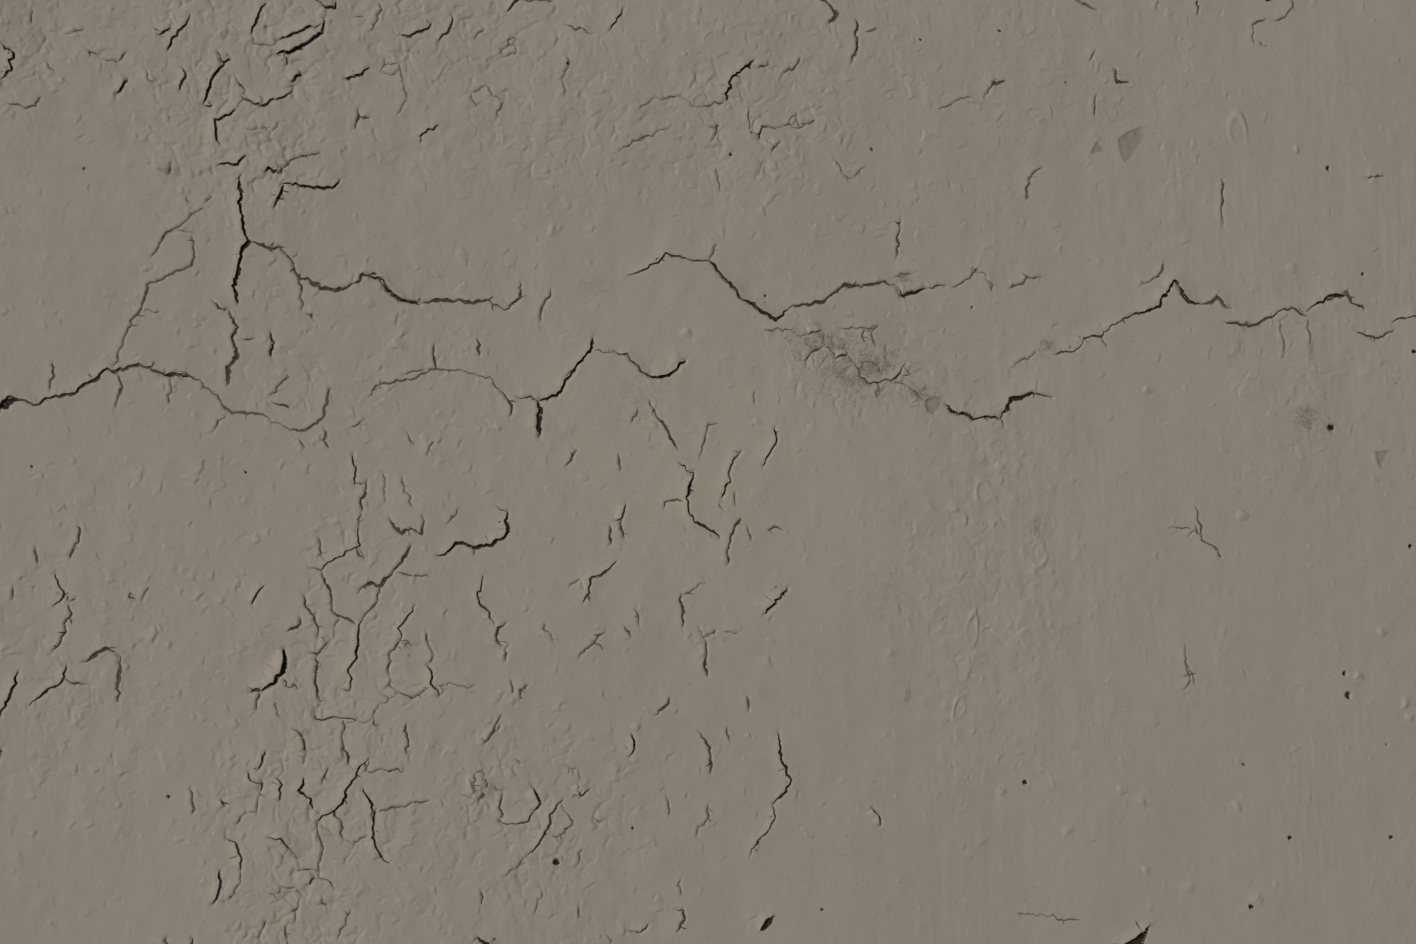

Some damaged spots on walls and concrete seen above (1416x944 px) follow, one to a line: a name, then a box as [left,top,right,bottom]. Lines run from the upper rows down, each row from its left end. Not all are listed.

crack [1024,167,1043,199]
crack [628,221,1040,322]
crack [945,262,1416,427]
crack [0,174,787,676]
crack [1170,508,1221,557]
crack [359,434,527,743]
crack [247,618,301,716]
crack [624,698,670,756]
crack [666,697,750,832]
crack [748,733,793,856]
crack [629,882,686,933]
peeling [1113,919,1151,944]